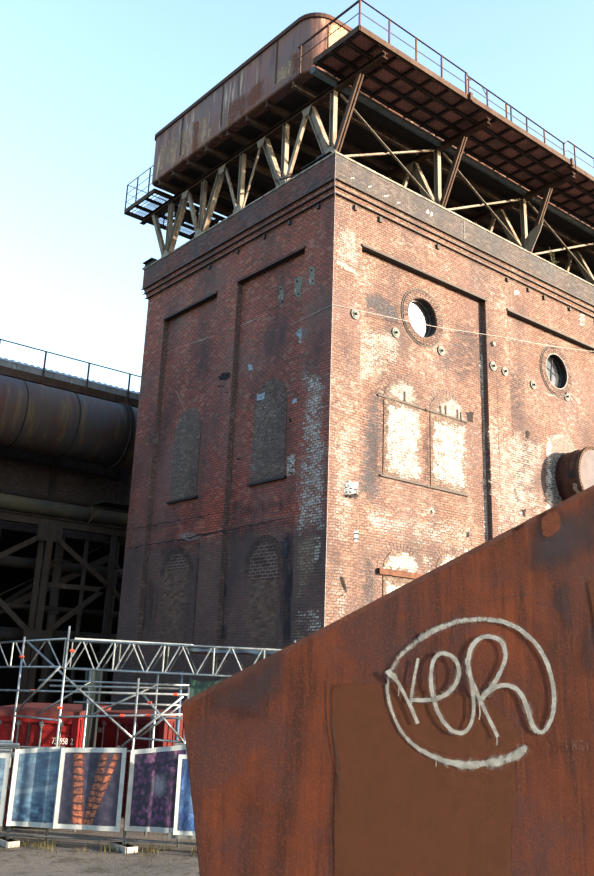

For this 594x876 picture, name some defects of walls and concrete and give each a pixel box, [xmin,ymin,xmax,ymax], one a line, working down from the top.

crack [127,511,295,550]
leakage [280,373,356,635]
rust [541,511,561,538]
rust [332,683,518,876]